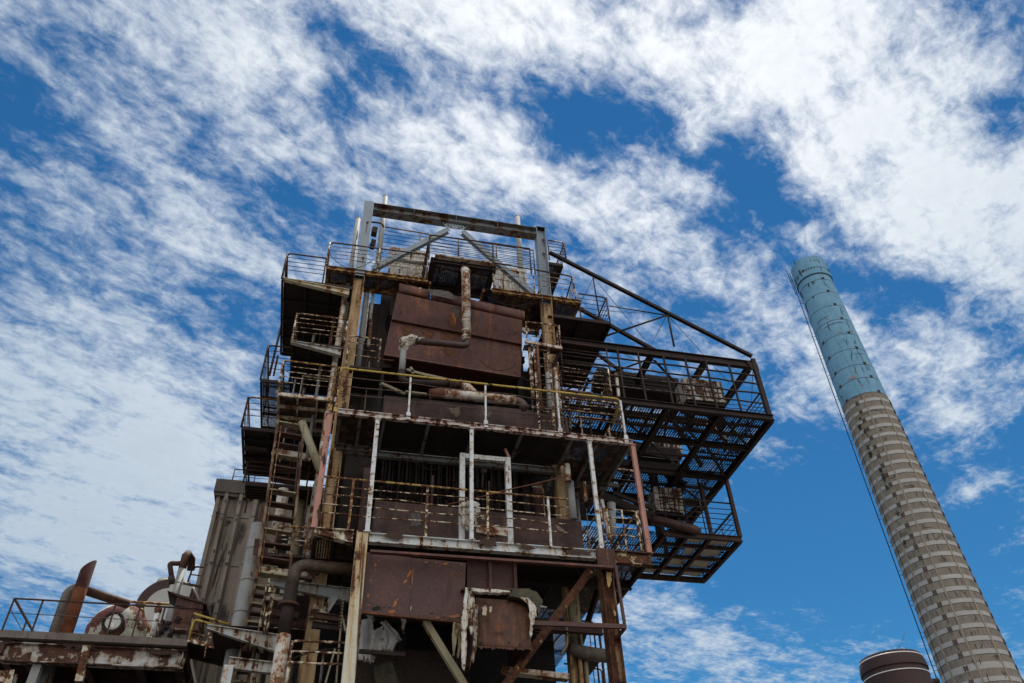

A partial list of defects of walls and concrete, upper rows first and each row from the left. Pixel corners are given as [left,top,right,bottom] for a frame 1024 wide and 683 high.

corrosion [355,534,365,669]